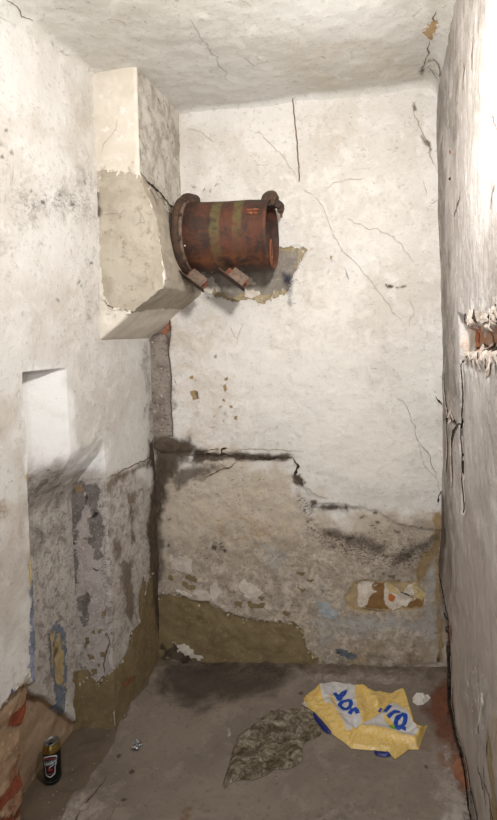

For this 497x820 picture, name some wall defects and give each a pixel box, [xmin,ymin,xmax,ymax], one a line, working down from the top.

flaking render [96,161,313,317]
crack [252,131,414,327]
leakage [174,453,291,490]
crack [187,447,325,498]
crack [393,373,461,503]
flaking render [460,304,497,513]
flaking render [0,554,35,820]
peeling [48,479,338,732]
leakage [160,642,285,704]
peeling [335,649,356,660]
peeling [345,579,426,614]